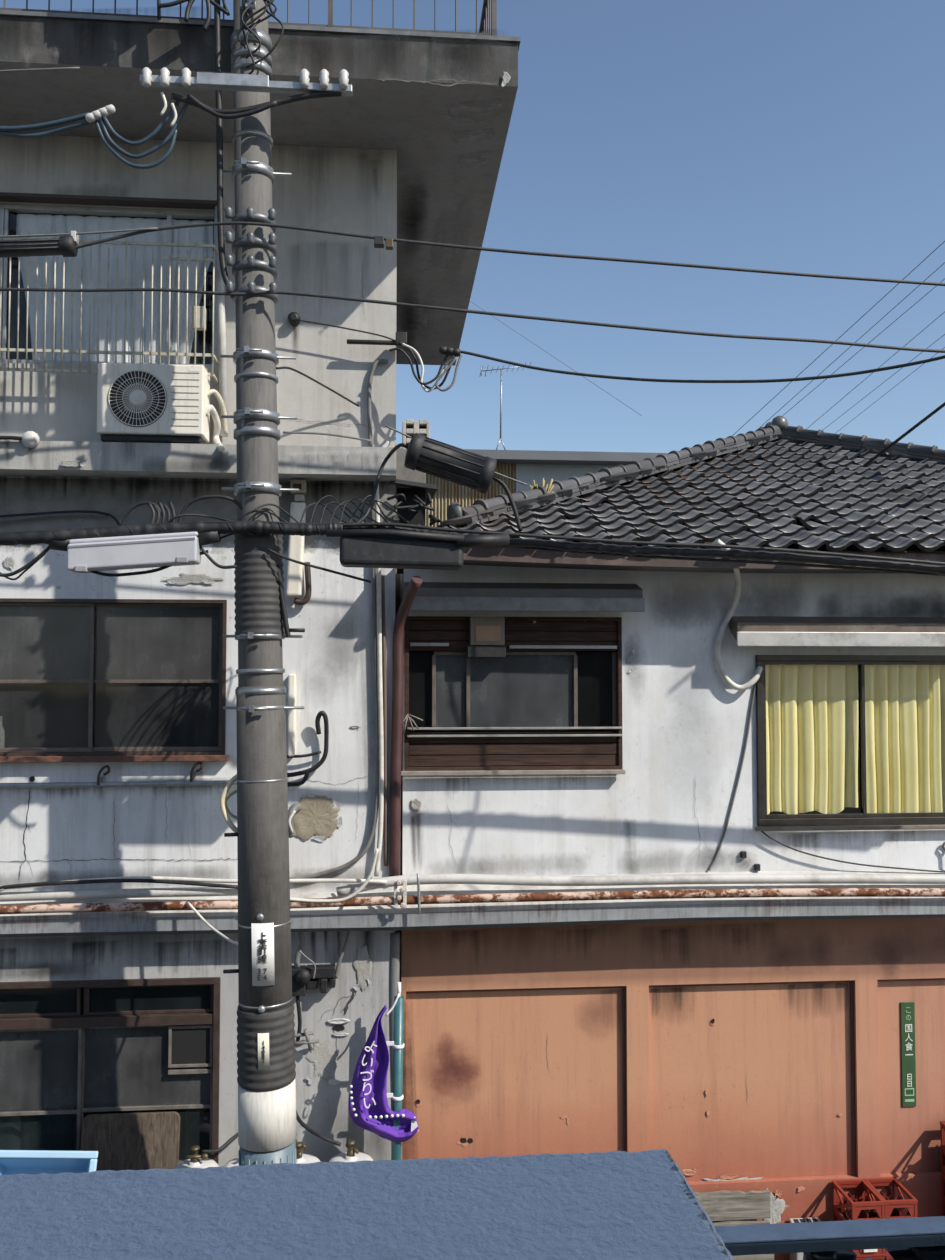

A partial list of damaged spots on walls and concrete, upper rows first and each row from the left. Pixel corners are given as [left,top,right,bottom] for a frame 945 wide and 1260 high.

crack [1,790,236,877]
spalling [291,793,342,842]